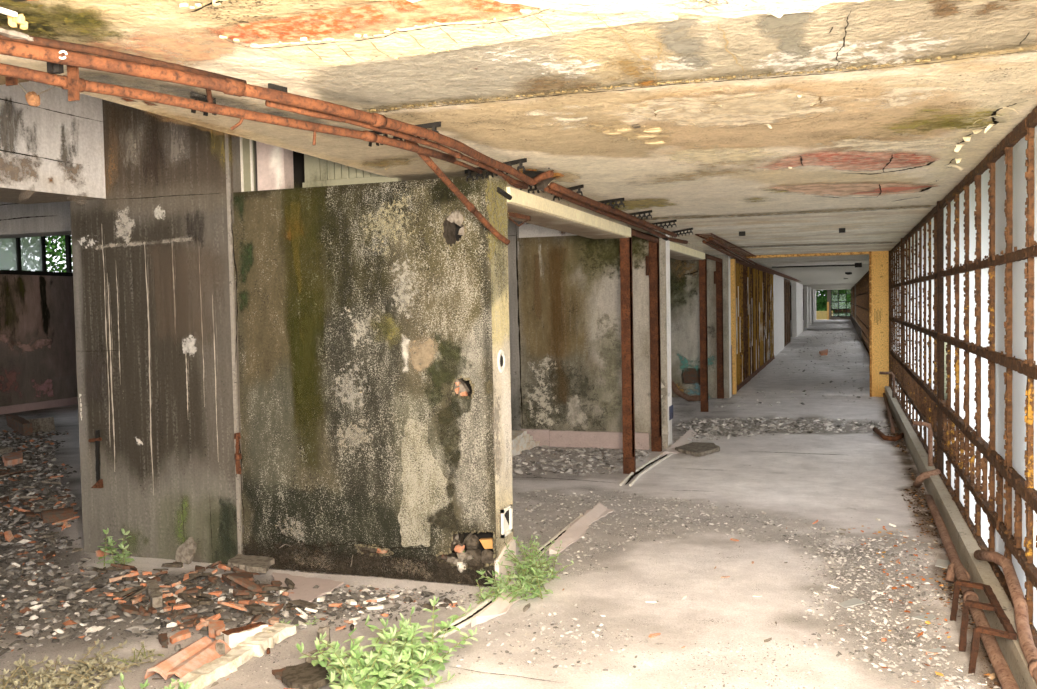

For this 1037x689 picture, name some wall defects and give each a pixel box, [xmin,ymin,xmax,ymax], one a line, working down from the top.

flaking render [81,0,869,67]
crack [828,11,851,69]
leakage [0,98,41,184]
leakage [58,123,82,182]
spalling [756,102,1021,198]
leakage [341,189,418,347]
spalling [441,209,467,248]
leakage [334,361,366,408]
leakage [513,314,622,431]
leakage [337,420,374,453]
leakage [422,334,472,534]
flaking render [242,418,502,587]